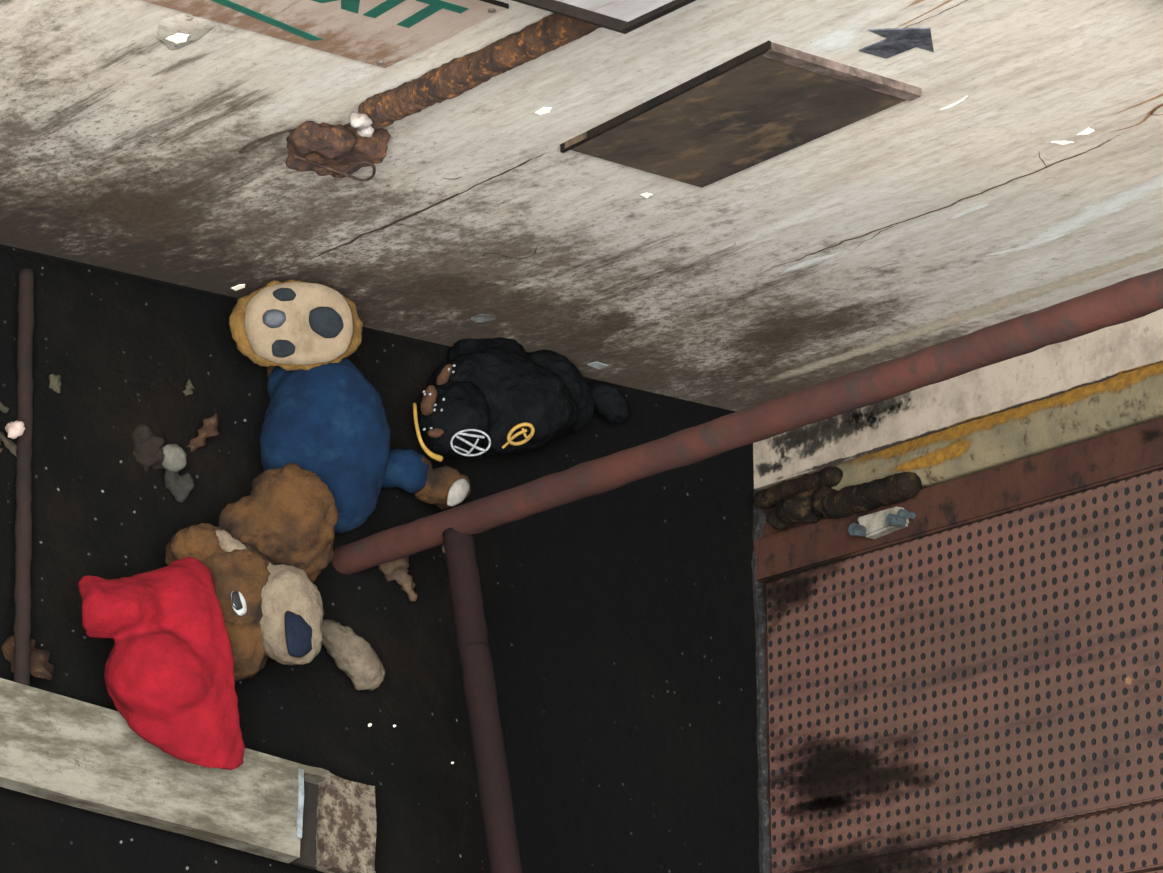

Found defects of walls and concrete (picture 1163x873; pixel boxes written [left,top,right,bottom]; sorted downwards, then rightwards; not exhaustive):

damp [810,29,858,50]
rust [895,0,952,29]
damp [42,87,109,132]
damp [106,85,264,159]
rust [1118,94,1163,131]
damp [72,135,276,249]
crack [765,140,1110,272]
damp [383,249,730,354]
damp [757,393,911,477]
rust [803,360,1163,472]
damp [780,738,932,821]